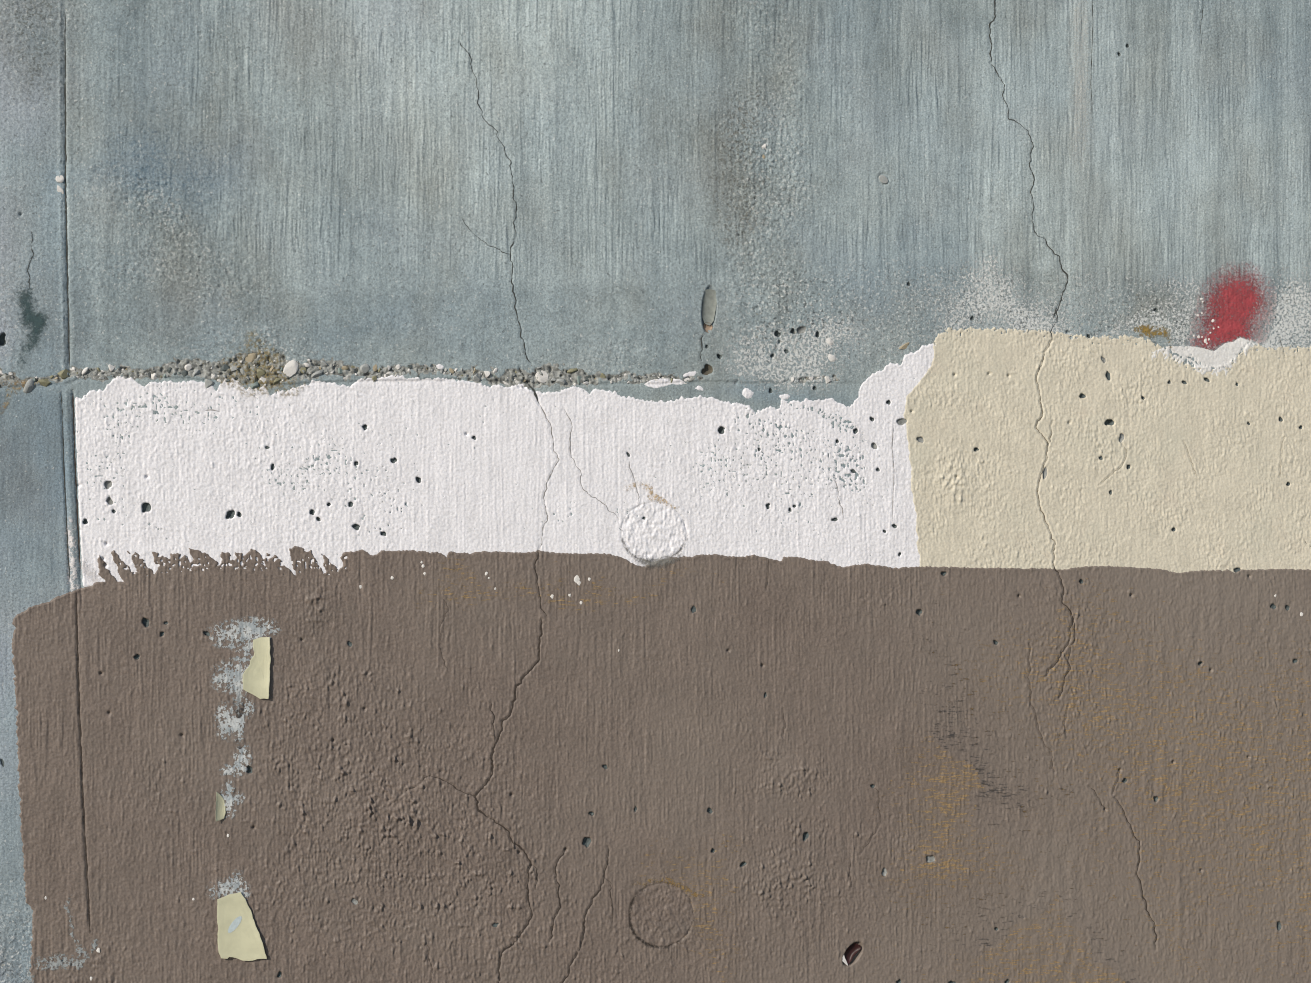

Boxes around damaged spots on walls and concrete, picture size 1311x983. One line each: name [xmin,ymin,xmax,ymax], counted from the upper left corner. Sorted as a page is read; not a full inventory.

crack [989,0,1075,770]
crack [406,41,639,983]
peeling [209,617,280,716]
peeling [216,780,246,821]
peeling [209,872,267,961]
crack [1091,770,1157,947]